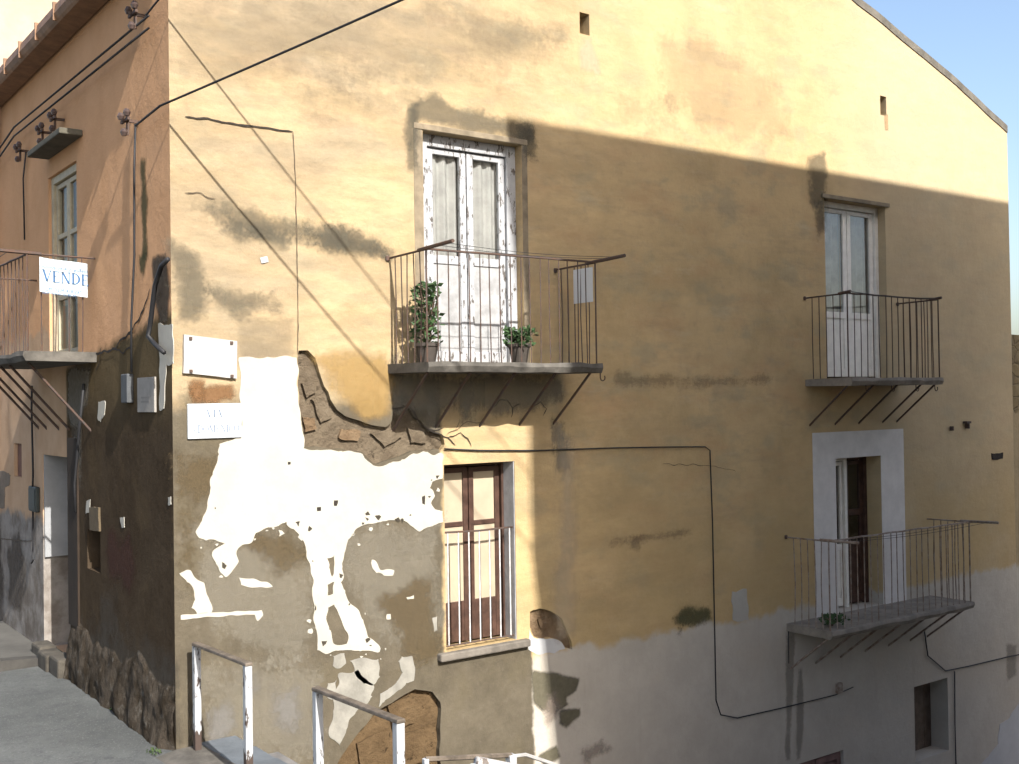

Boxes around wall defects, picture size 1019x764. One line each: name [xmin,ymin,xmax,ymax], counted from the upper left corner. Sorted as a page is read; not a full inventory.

leakage [139,161,170,323]
leakage [0,534,23,610]
flaking render [179,570,263,621]
flaking render [196,351,444,764]
flaking render [528,608,570,655]
leakage [676,607,710,625]